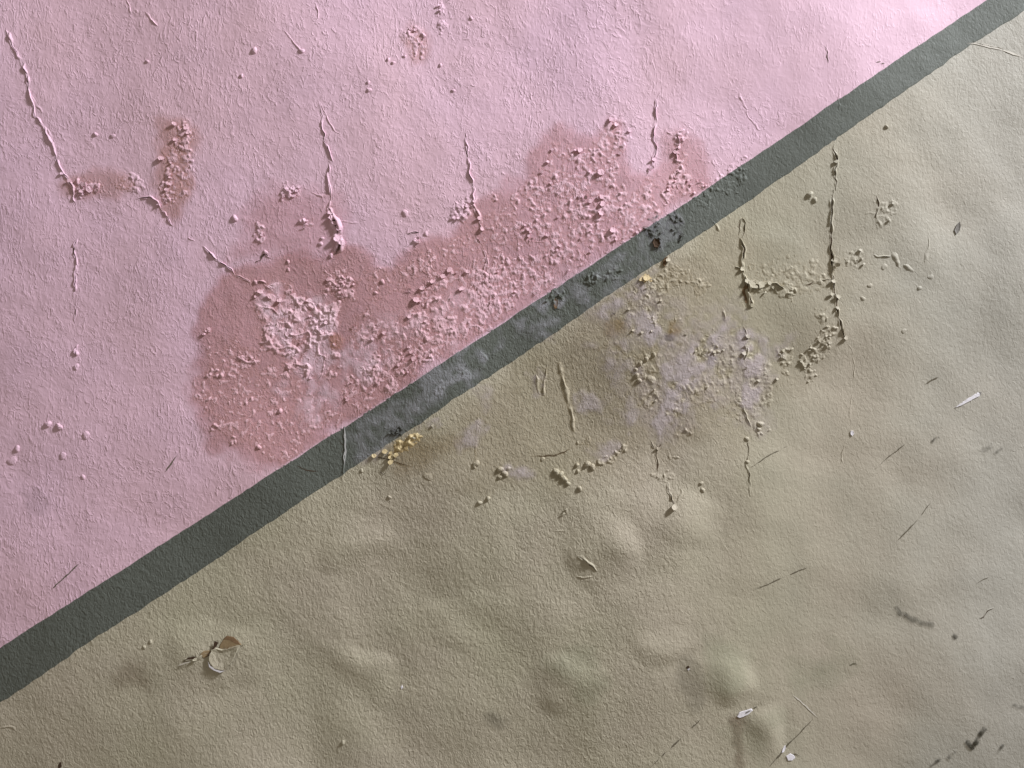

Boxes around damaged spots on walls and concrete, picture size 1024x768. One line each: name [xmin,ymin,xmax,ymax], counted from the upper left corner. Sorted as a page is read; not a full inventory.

crack [5,28,78,212]
crack [311,101,359,259]
damp [196,227,488,462]
crack [464,132,489,265]
peeling [191,110,839,468]
crack [648,91,680,190]
crack [721,90,855,418]
peeling [872,194,900,229]
peeling [179,636,253,673]